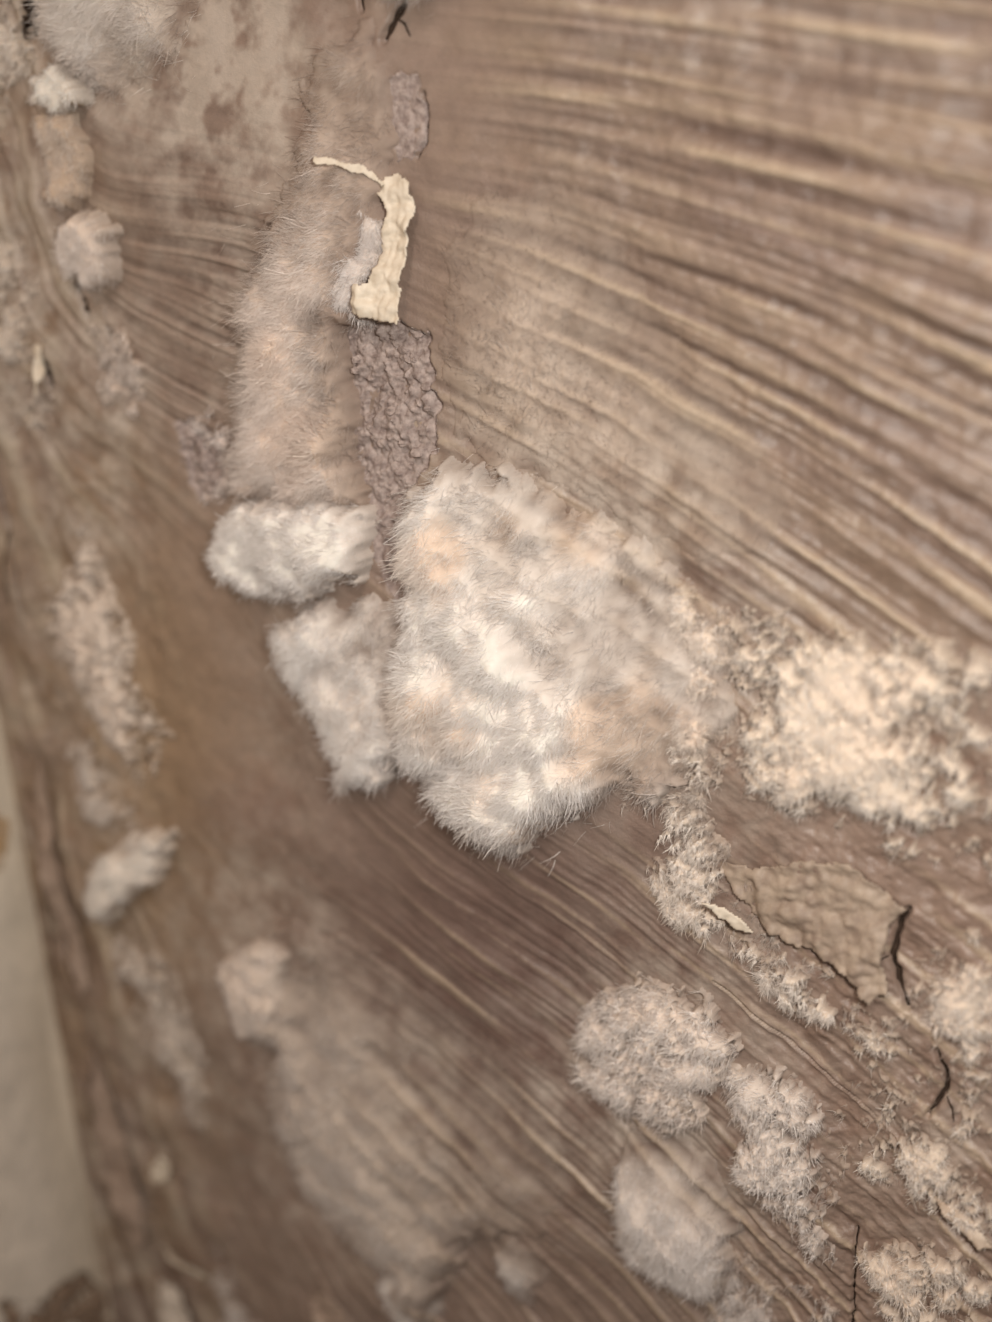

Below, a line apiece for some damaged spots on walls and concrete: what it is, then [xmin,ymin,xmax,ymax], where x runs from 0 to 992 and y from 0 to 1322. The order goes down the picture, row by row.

damp [0,0,203,442]
flaking render [347,320,443,605]
damp [185,16,992,1078]
damp [40,521,210,1132]
damp [206,906,579,1322]
damp [565,937,992,1322]
peeling [701,860,906,1005]
crack [881,906,912,1005]
crack [928,1050,954,1122]
flaking render [0,1271,111,1322]
crack [851,1226,859,1322]